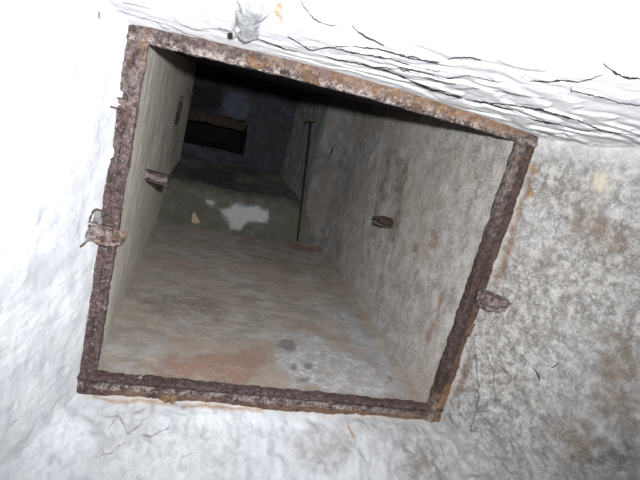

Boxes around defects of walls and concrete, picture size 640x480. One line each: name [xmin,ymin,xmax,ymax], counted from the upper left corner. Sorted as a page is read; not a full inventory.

rust [245,56,265,70]
rust [301,70,321,85]
crack [256,2,640,148]
rust [150,394,177,405]
crack [94,415,170,459]